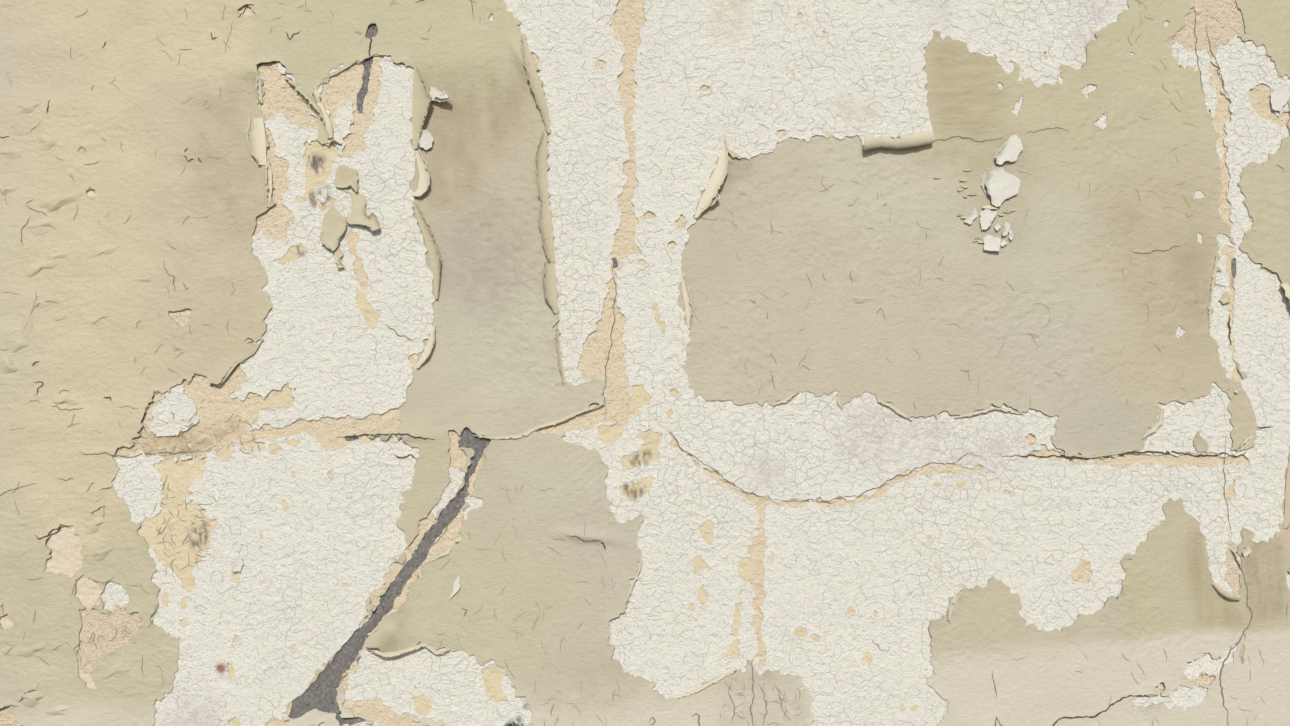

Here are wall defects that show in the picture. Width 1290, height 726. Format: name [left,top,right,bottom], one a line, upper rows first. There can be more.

crack [269,1,372,58]
spalling [366,24,378,38]
crack [1122,0,1232,351]
crack [134,287,184,374]
peeling [112,54,534,726]
crack [745,271,852,393]
peeling [489,0,1290,726]
crack [818,177,1050,394]
peeling [44,525,129,611]
crack [321,459,621,726]
crack [667,426,1271,726]